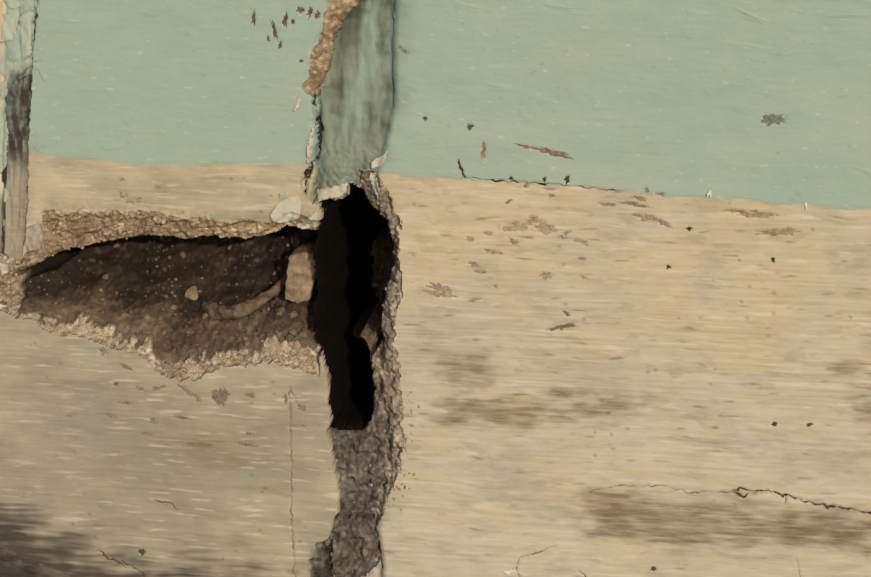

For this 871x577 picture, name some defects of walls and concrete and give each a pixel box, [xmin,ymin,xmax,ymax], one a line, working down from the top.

peeling [0,0,32,99]
flaking render [266,0,362,112]
peeling [0,113,8,174]
peeling [369,151,388,201]
spalling [0,178,349,402]
peeling [211,388,231,407]
crack [288,390,320,577]
leakage [591,495,738,543]
crack [588,484,871,515]
spalling [309,534,335,577]
crack [317,538,333,577]